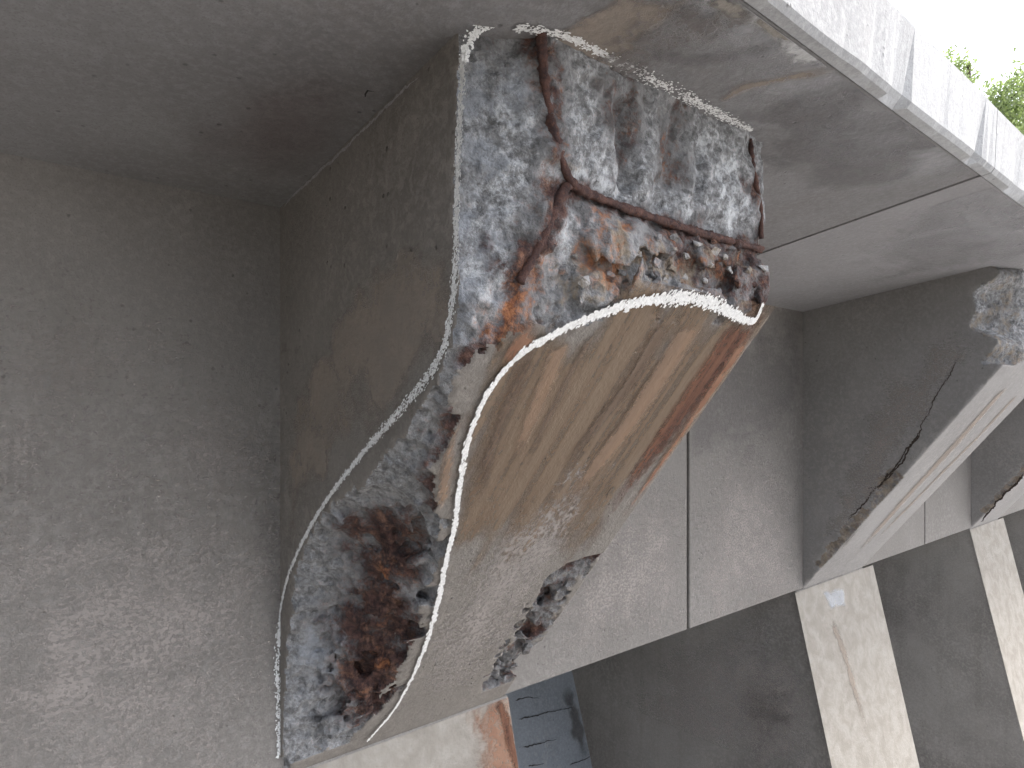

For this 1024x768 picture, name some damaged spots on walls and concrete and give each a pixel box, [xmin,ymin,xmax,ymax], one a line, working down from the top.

spalling [970,266,1024,366]
spalling [281,32,770,768]
corrosion [438,282,767,561]
crack [848,358,959,520]
crack [981,474,1023,522]
corrosion [476,701,519,768]